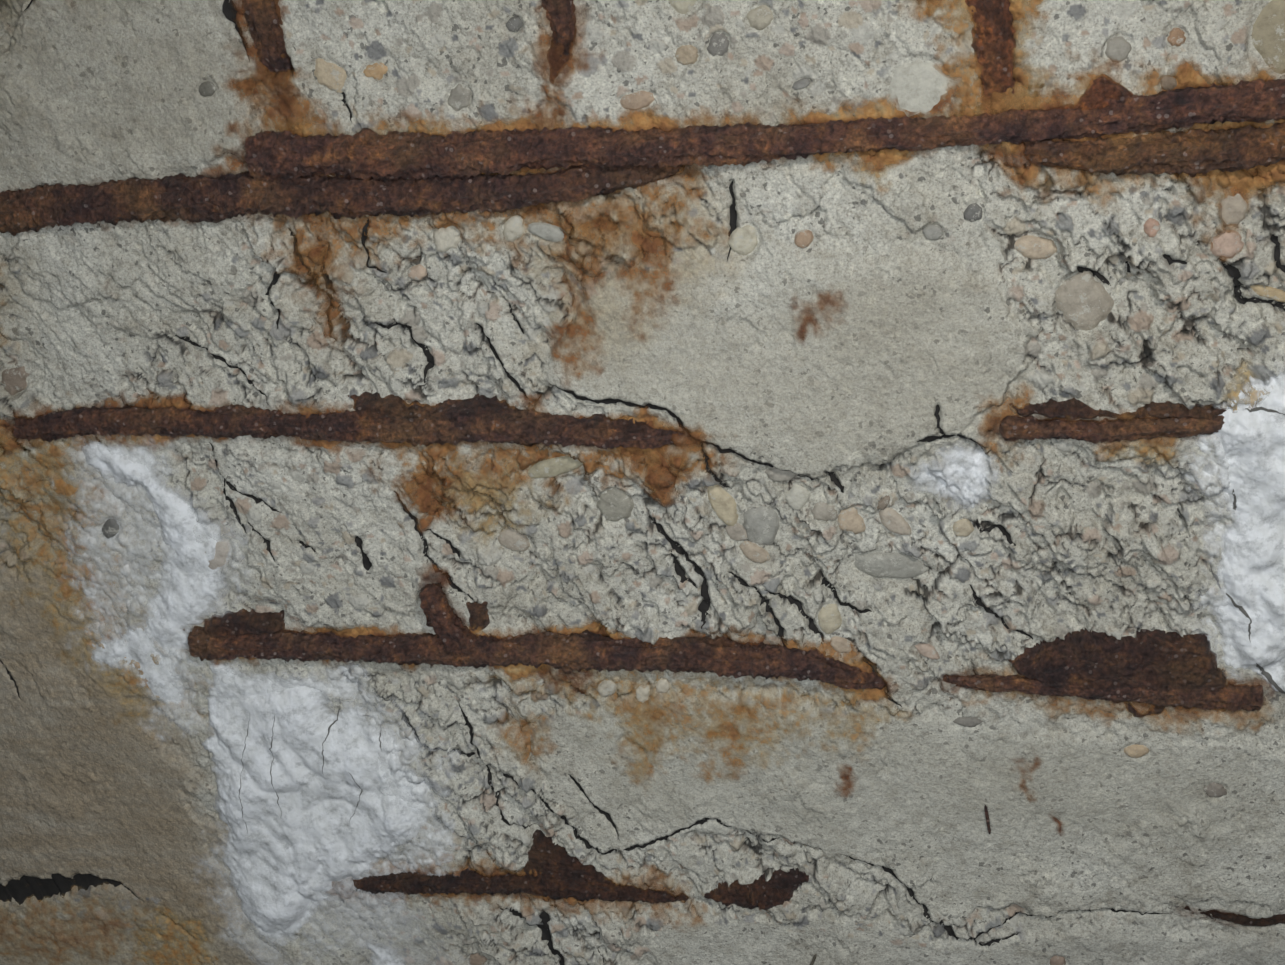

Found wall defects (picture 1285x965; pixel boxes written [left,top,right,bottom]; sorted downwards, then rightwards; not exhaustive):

spalling [98,172,758,419]
spalling [278,0,984,136]
rust [0,0,1285,378]
crack [476,303,844,493]
spalling [963,150,1285,419]
efflorescence [73,441,452,945]
rust [0,392,725,717]
rust [183,565,897,780]
spalling [173,438,1235,965]
crack [650,517,872,645]
crack [374,689,1168,946]
efflorescence [1185,373,1285,694]